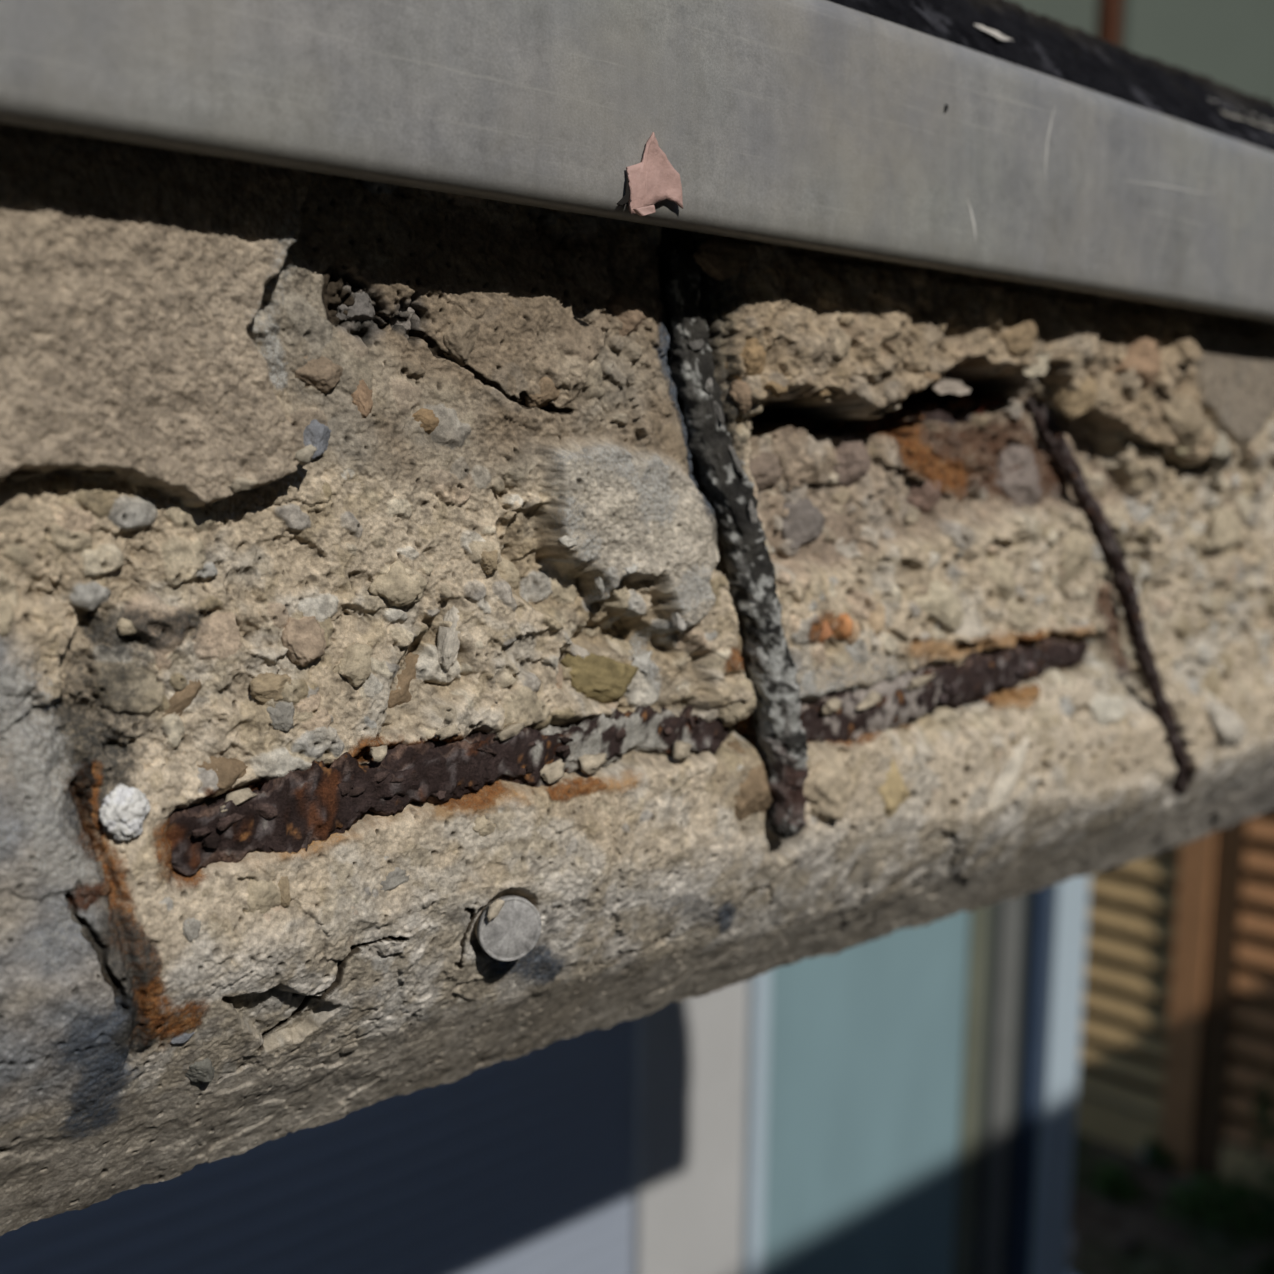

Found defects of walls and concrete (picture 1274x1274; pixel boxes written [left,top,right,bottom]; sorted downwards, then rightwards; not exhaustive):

crack [356,285,573,414]
spalling [0,171,1274,968]
rust [912,585,1130,674]
rust [205,781,264,801]
rust [345,735,464,761]
rust [436,781,523,813]
rust [733,714,759,753]
rust [65,762,206,1042]
crack [456,908,477,968]
crack [583,860,859,971]
spalling [170,1032,195,1044]
crack [257,936,409,1051]